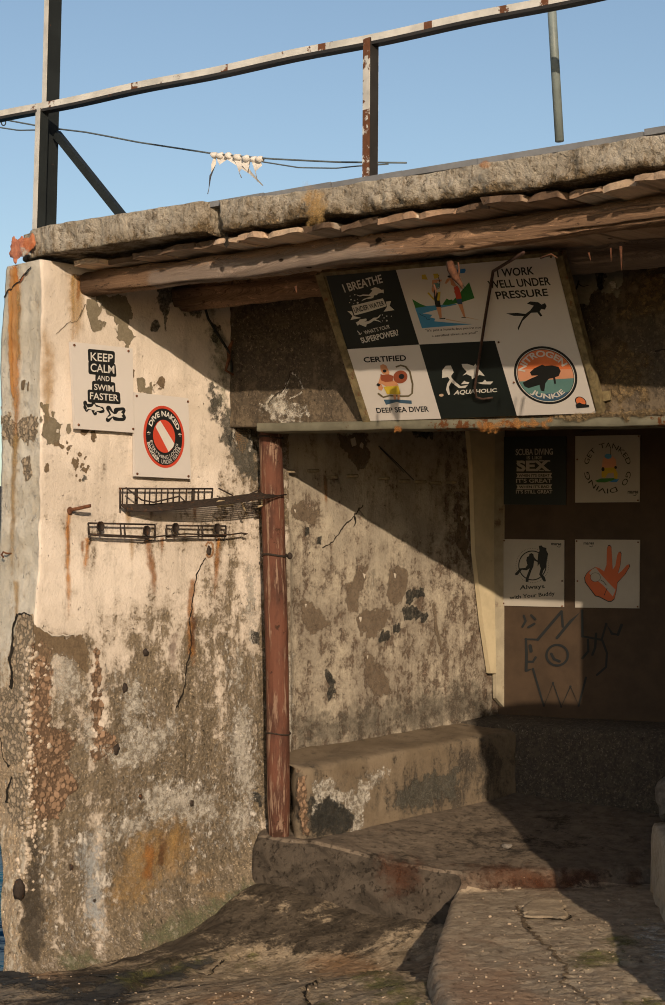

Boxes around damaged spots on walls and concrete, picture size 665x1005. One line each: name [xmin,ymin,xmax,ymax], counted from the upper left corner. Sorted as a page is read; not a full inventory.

rust [8,268,20,420]
flaking render [86,294,136,348]
flaking render [1,402,97,482]
flaking render [337,433,370,470]
crack [322,505,364,548]
crack [176,558,206,708]
damp [307,766,391,837]
crack [514,905,600,1005]
crack [302,980,318,1005]